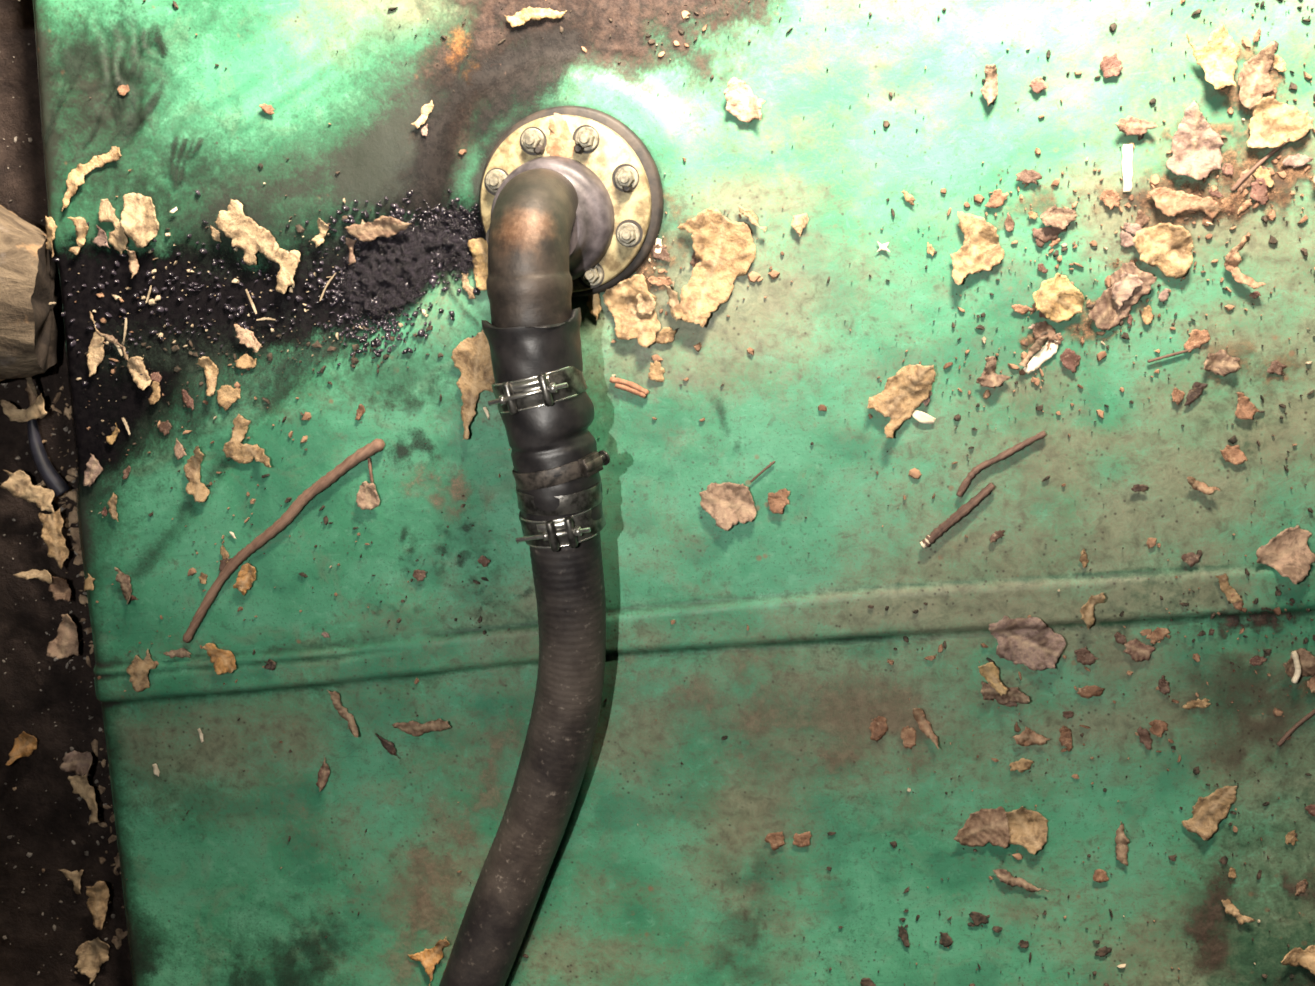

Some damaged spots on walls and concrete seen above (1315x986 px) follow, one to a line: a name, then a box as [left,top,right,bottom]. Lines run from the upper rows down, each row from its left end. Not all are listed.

damp [84,26,165,150]
damp [171,137,204,186]